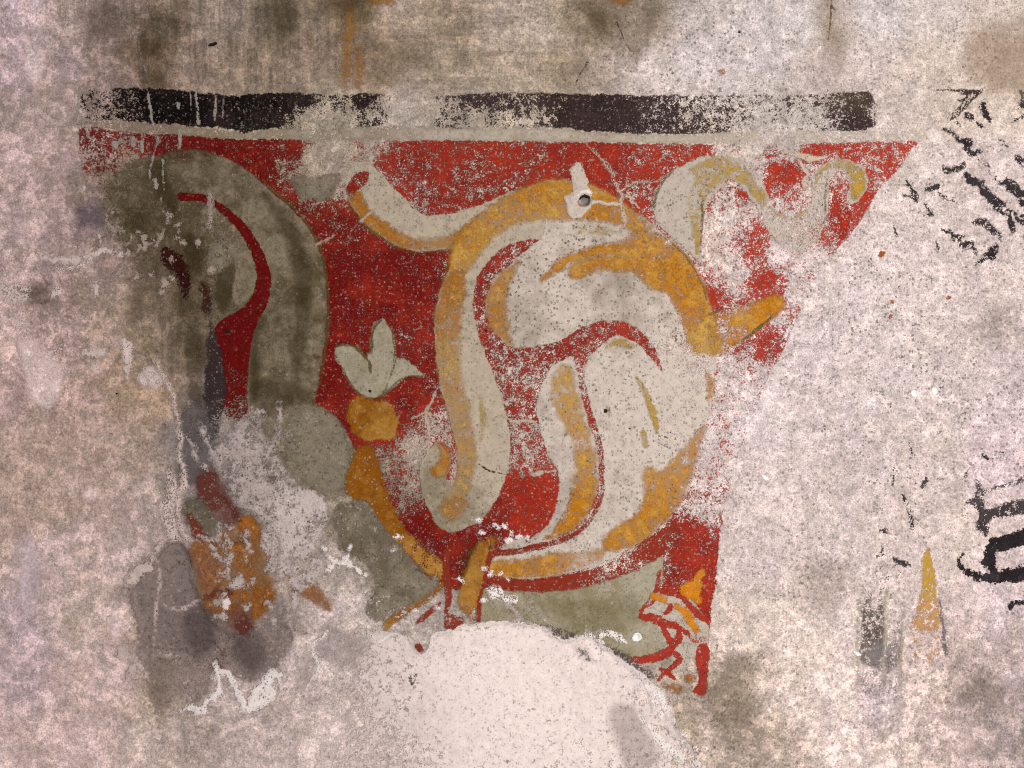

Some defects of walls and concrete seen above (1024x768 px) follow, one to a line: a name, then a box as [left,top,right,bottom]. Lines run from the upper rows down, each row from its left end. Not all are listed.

flaking render [303,620,695,768]